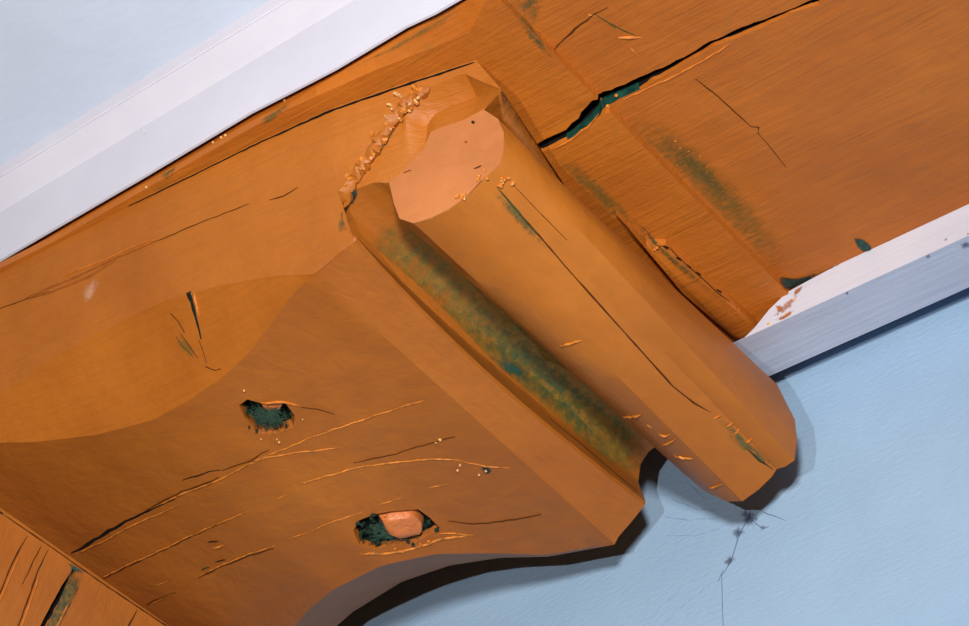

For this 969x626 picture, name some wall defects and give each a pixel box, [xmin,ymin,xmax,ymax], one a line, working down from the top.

crack [539,0,819,167]
peeling [339,84,430,224]
crack [511,188,710,412]
crack [653,245,729,301]
crack [0,400,504,626]
crack [438,514,541,536]
crack [661,507,784,626]